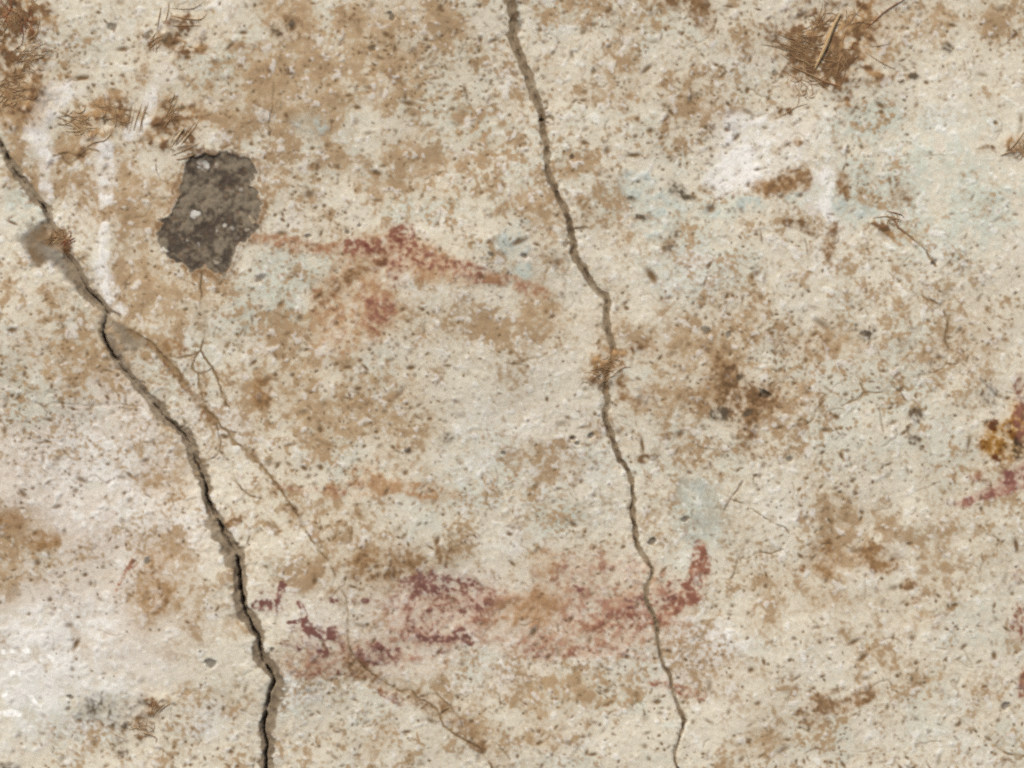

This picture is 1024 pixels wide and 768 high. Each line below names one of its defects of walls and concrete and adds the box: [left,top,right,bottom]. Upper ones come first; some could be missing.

spalling [150,141,271,284]
crack [501,0,617,345]
crack [600,1,637,56]
crack [0,135,538,768]
crack [600,394,688,768]